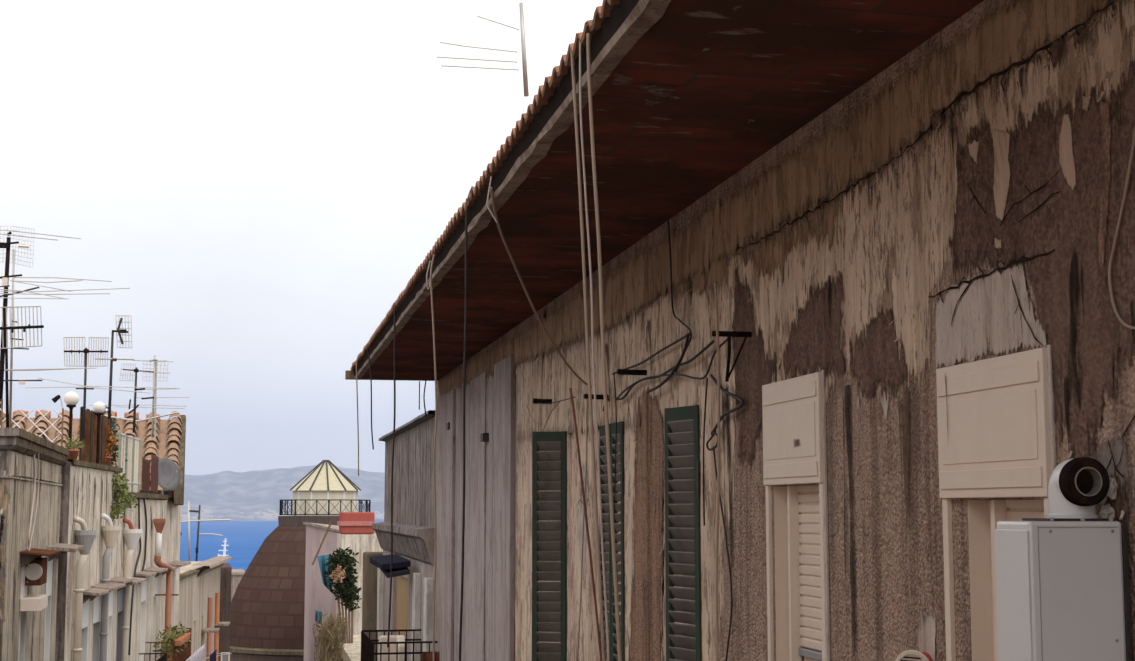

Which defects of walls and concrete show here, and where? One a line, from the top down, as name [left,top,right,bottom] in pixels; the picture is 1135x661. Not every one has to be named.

peeling [730,189,908,469]
crack [736,2,1113,250]
peeling [949,55,1135,459]
flaking render [1096,468,1130,525]